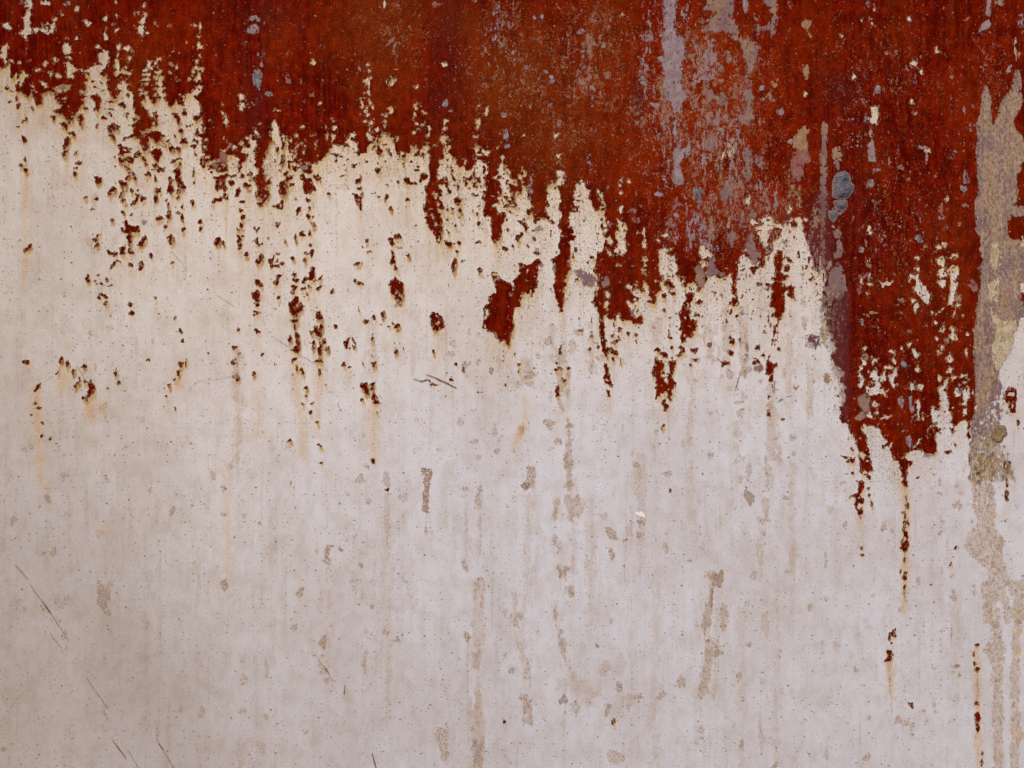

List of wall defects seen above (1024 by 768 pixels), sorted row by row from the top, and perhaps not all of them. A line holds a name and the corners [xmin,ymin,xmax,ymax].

peeling [241,15,260,44]
leakage [979,0,1004,32]
peeling [253,49,273,105]
peeling [691,0,791,190]
corrosion [0,0,1024,602]
peeling [572,268,610,289]
peeling [693,187,787,287]
peeling [785,121,904,363]
peeling [898,361,914,413]
leakage [954,14,1024,768]
corrosion [883,618,913,698]
corrosion [950,643,981,735]